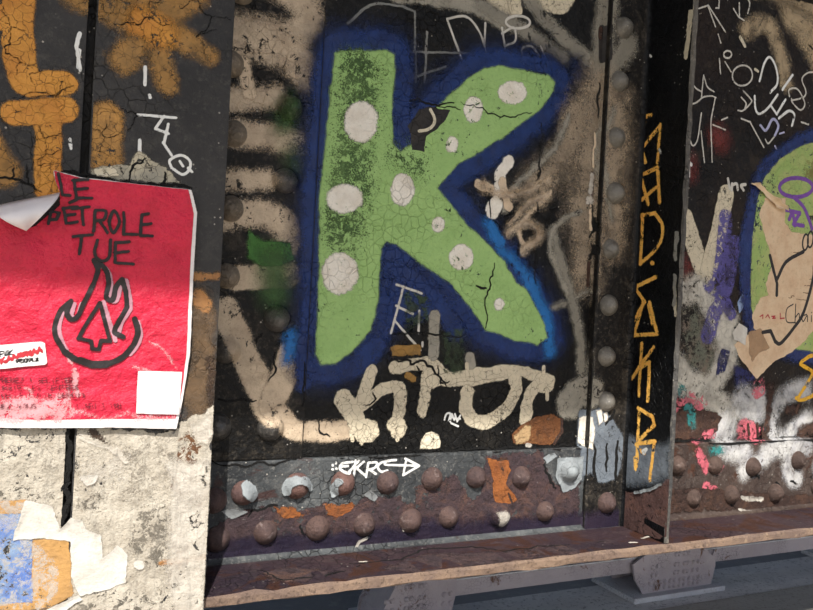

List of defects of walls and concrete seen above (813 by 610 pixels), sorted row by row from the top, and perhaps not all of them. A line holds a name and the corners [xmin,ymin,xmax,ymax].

crack [2,6,74,98]
crack [93,108,139,154]
crack [0,128,192,193]
crack [439,102,544,284]
crack [392,330,463,338]
crack [268,353,277,381]
crack [388,359,450,386]
crack [211,421,583,468]
peeling [0,428,66,528]
rust [487,458,517,504]
peeling [67,405,813,610]
rust [349,544,581,573]